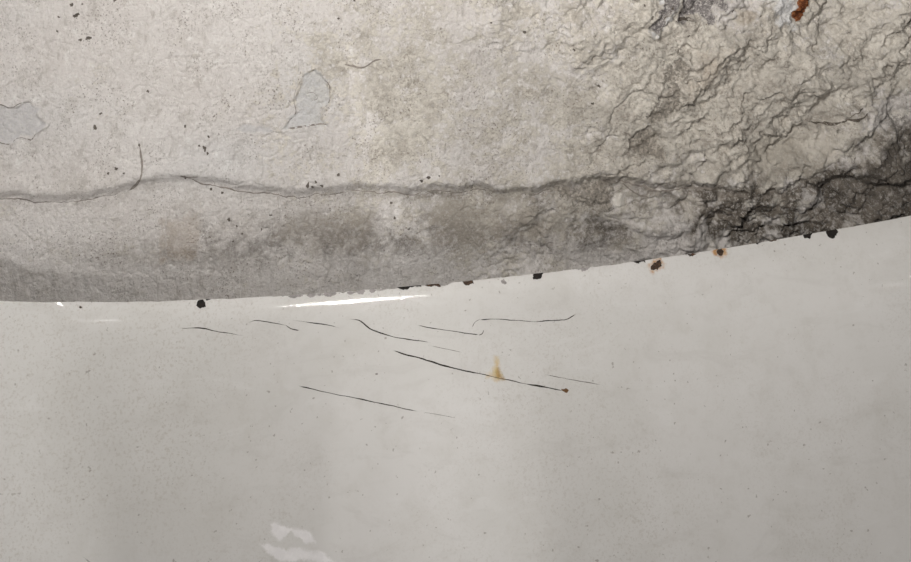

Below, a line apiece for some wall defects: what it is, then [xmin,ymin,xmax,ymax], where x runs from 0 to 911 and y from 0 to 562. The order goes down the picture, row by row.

spalling [648,0,761,42]
peeling [771,0,803,34]
rust [791,0,809,22]
leakage [675,40,741,104]
peeling [0,101,49,147]
crack [4,148,143,203]
crack [181,176,555,199]
leakage [818,111,911,227]
crack [183,315,595,391]
rust [485,355,506,384]
crack [301,386,453,418]
peeling [267,520,317,547]